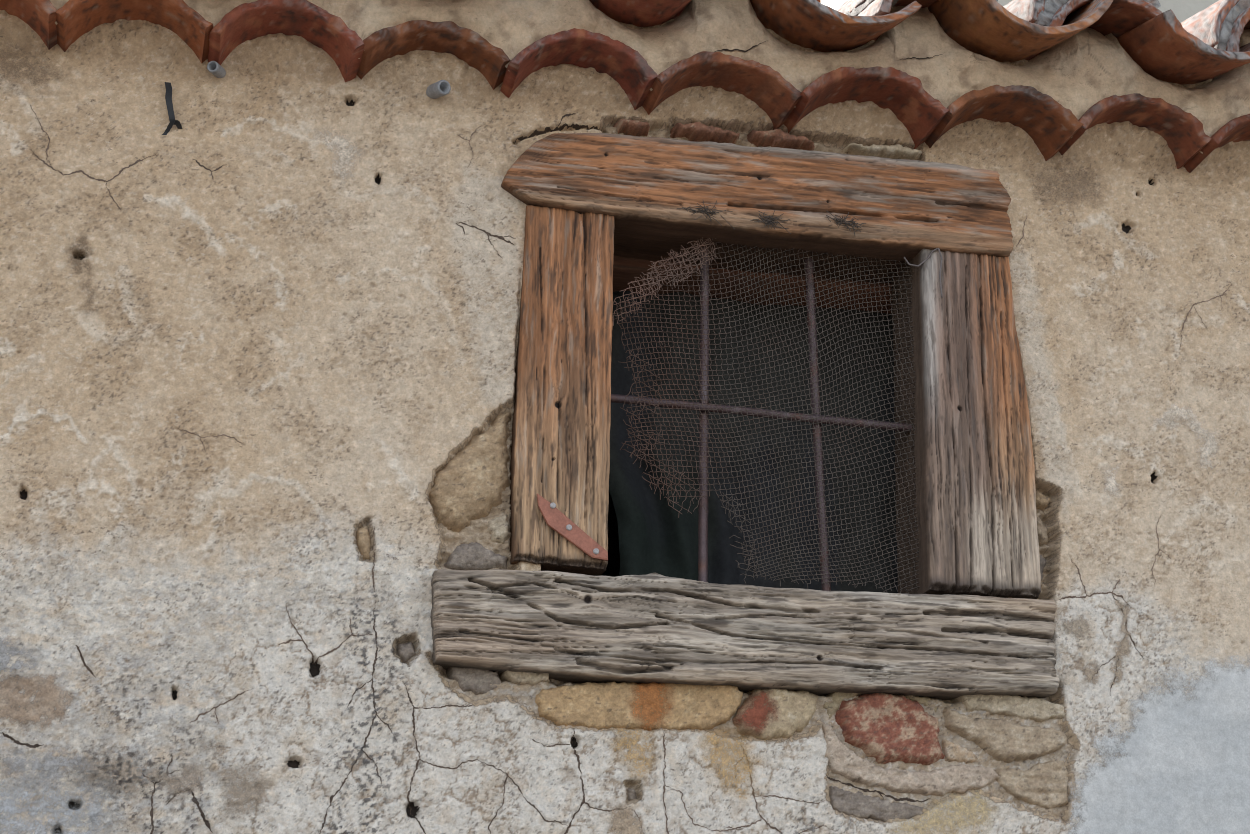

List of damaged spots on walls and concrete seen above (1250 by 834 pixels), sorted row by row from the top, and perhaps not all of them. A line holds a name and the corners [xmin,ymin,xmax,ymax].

crack [30,105,154,210]
crack [513,112,600,144]
crack [1180,285,1231,347]
flaking render [353,518,375,562]
flaking render [426,398,521,570]
flaking render [1035,479,1062,600]
crack [279,526,930,834]
flaking render [326,595,1131,834]
crack [1059,562,1144,696]